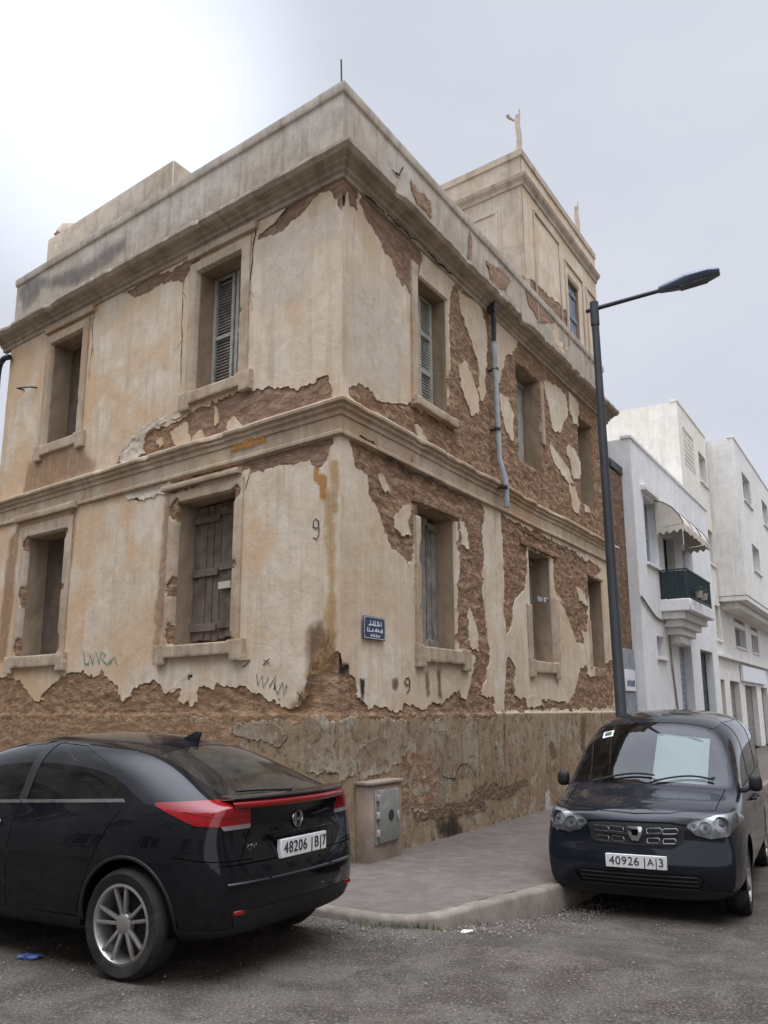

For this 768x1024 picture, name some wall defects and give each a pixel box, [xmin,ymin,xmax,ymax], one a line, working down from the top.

damp [20,244,121,305]
crack [175,274,186,368]
spalling [258,178,422,294]
peeling [410,180,432,218]
spalling [486,260,568,351]
spalling [118,375,333,464]
spalling [348,284,605,539]
rust [314,466,327,499]
damp [311,460,338,673]
spalling [0,438,614,822]